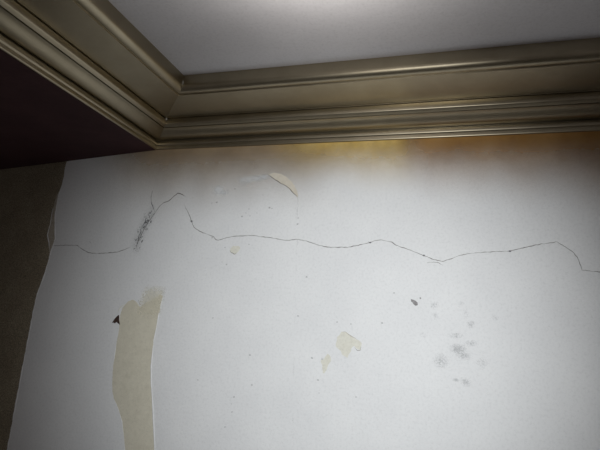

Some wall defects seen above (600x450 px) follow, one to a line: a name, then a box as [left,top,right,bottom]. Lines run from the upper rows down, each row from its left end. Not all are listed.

peeling [112,294,163,450]